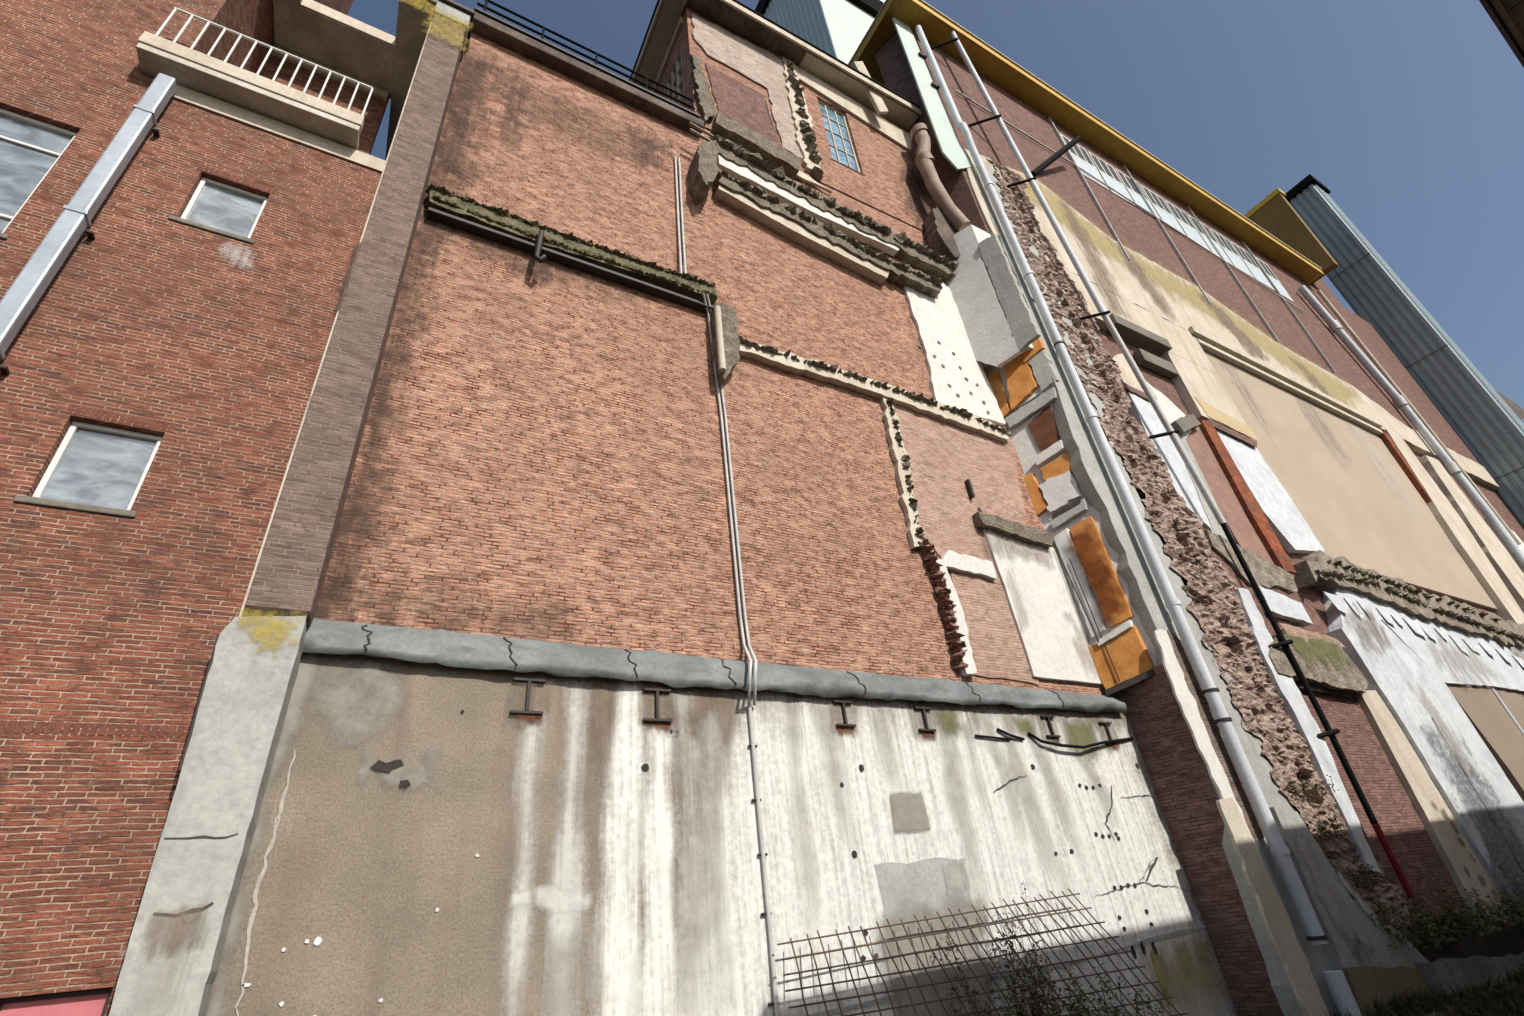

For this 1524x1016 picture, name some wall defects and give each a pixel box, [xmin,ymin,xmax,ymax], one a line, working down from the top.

rust [518,681,541,726]
rust [640,686,671,731]
rust [830,702,852,734]
rust [912,706,936,738]
spalling [358,749,437,789]
crack [994,775,1026,792]
crack [1105,785,1159,840]
leakage [1422,728,1524,914]
leakage [508,679,734,1016]
crack [164,749,296,1016]
crack [1096,853,1194,896]
crack [153,902,214,917]